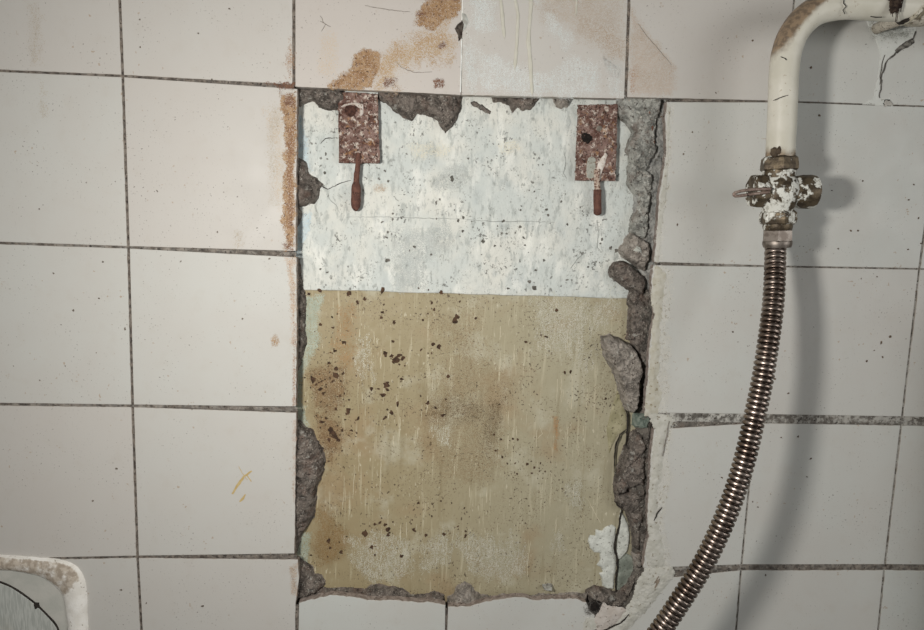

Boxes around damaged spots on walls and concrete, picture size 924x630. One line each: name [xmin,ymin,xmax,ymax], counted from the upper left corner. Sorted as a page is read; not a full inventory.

rust [316,0,462,97]
damp [533,0,679,101]
crack [869,16,916,98]
spalling [377,92,539,133]
rust [262,36,364,462]
spalling [292,87,505,604]
damp [408,298,525,492]
damp [528,282,627,371]
spalling [531,98,666,611]
damp [341,526,531,585]